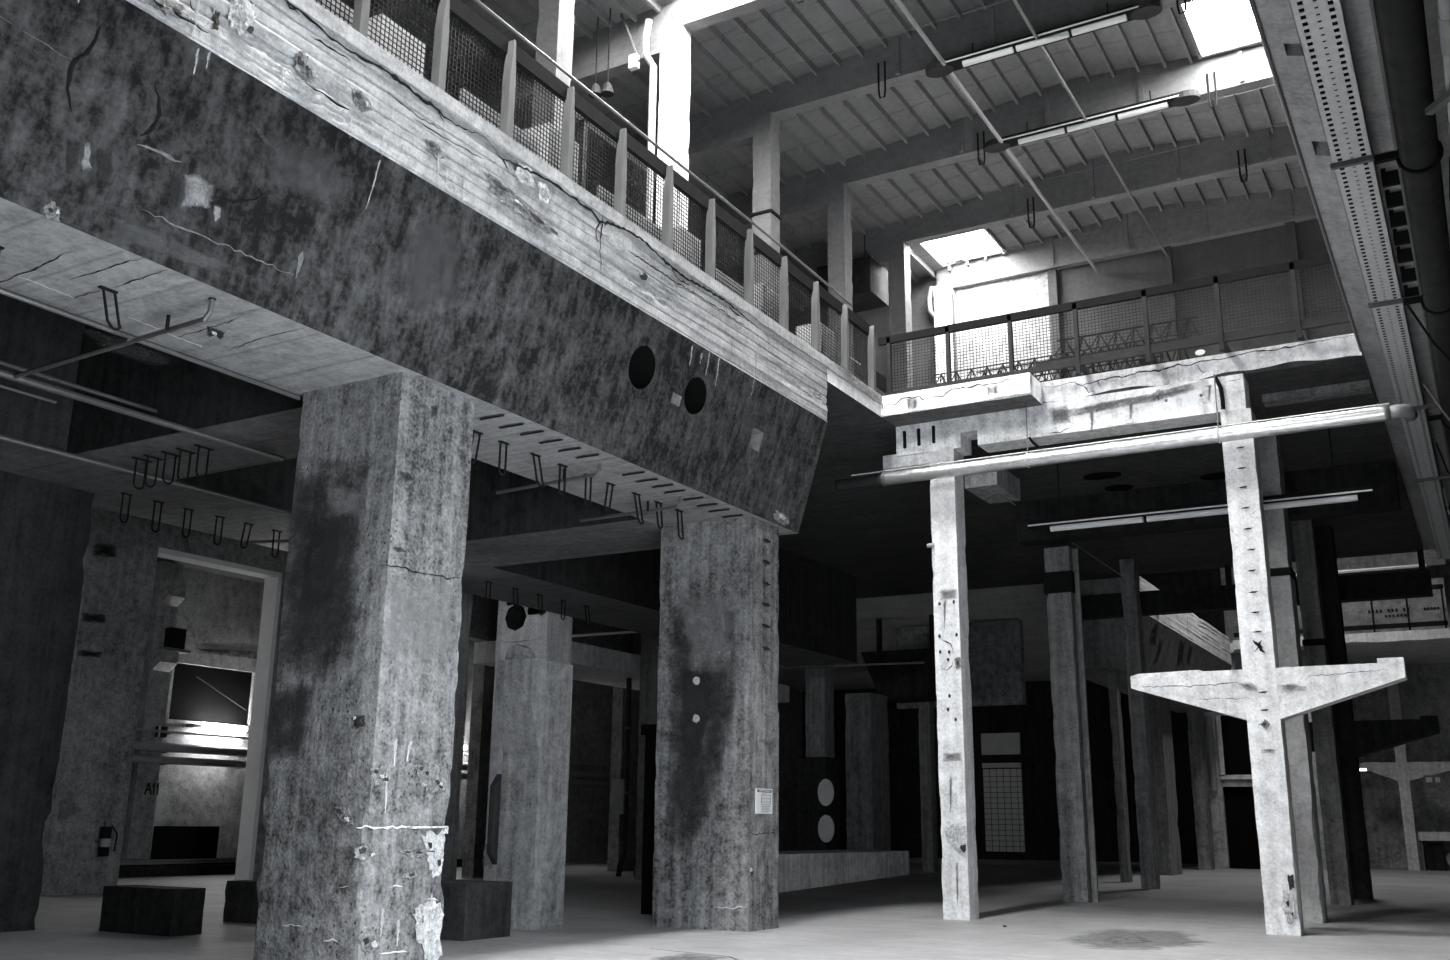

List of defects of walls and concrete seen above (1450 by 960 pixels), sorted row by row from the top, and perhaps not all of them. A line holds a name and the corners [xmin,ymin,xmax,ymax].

spalling [294,51,318,84]
spalling [351,88,373,113]
spalling [354,842,379,861]
spalling [397,829,446,880]
spalling [357,928,381,956]
spalling [413,899,444,960]